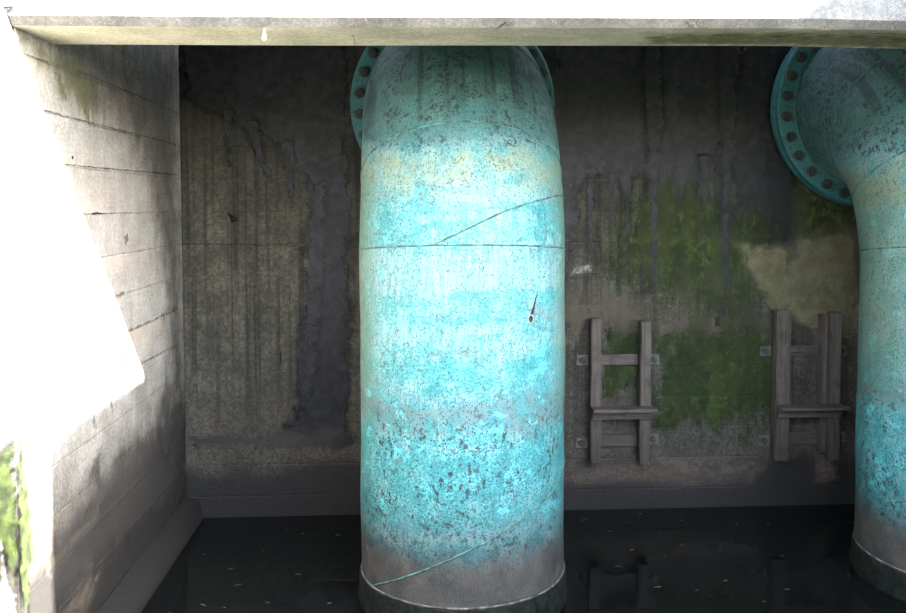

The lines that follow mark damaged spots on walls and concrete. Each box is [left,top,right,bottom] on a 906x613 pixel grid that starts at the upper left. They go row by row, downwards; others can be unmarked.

damp [51,45,355,613]
damp [544,46,796,337]
damp [0,574,13,613]